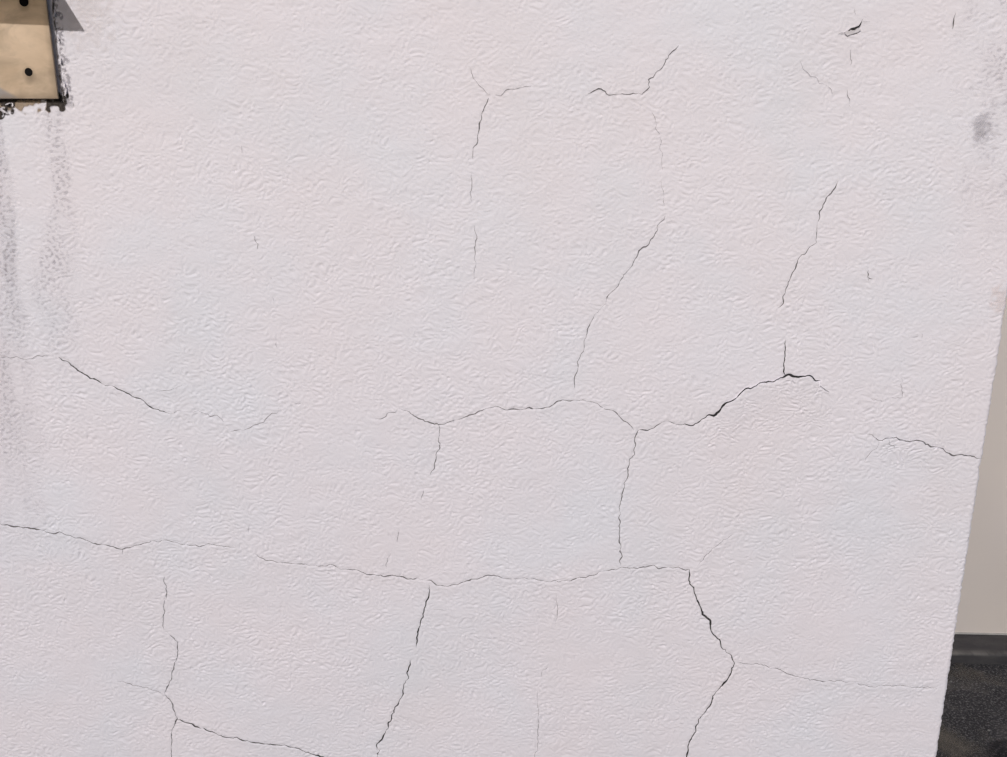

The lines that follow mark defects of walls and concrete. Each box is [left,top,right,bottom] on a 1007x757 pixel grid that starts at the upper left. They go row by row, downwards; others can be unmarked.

crack [591,45,679,95]
crack [471,72,529,146]
crack [8,355,300,431]
crack [259,116,931,757]
crack [866,434,980,459]
crack [1,524,234,552]
crack [119,579,323,757]